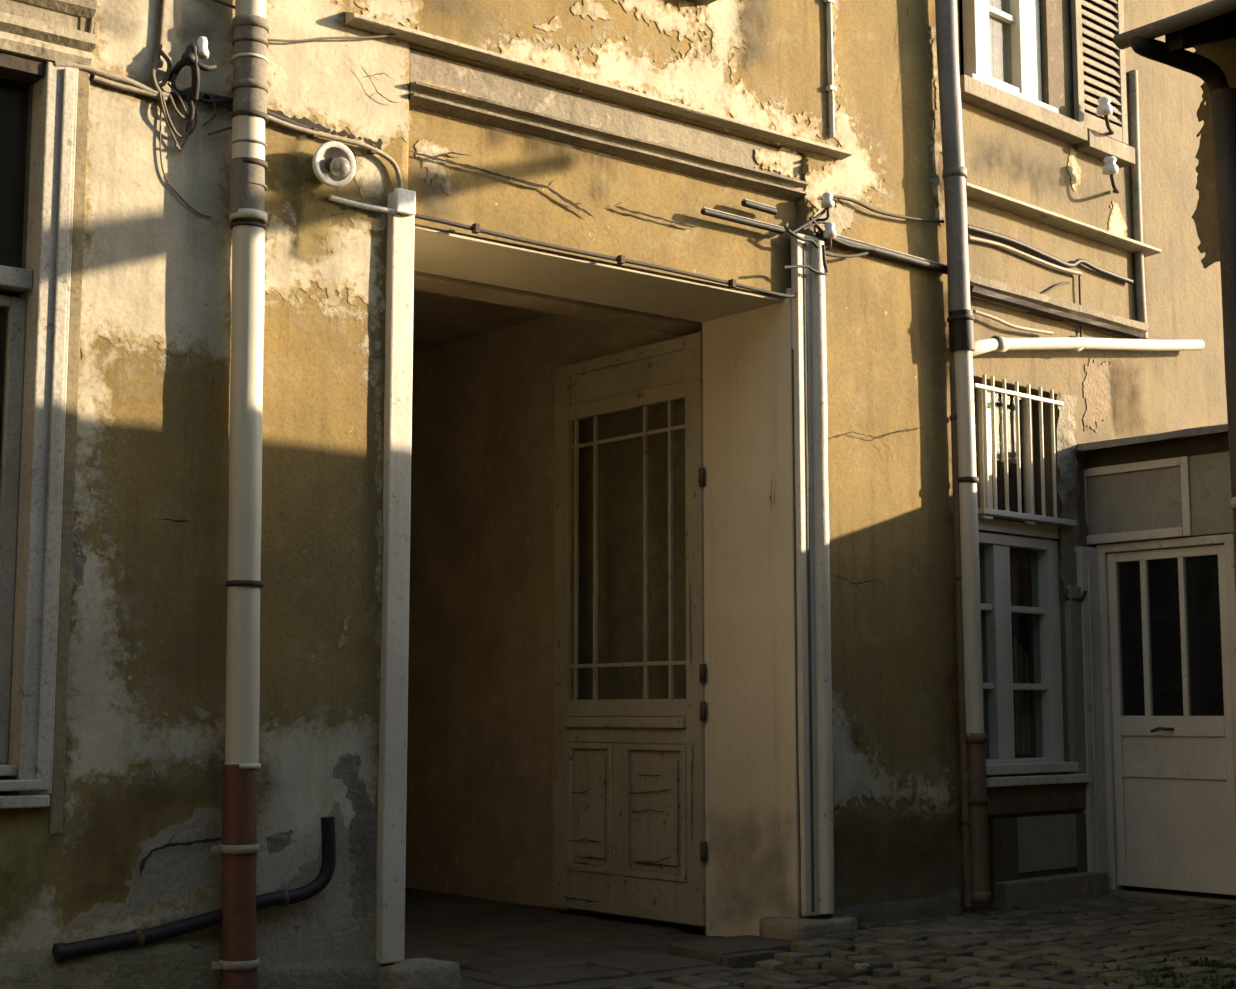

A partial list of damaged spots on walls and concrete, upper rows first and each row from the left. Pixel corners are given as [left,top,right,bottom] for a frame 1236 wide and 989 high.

crack [361,66,399,103]
peeling [472,0,892,235]
crack [410,151,698,228]
peeling [264,0,472,650]
peeling [63,0,235,862]
peeling [0,882,220,957]
crack [140,836,222,877]
peeling [256,666,381,918]
peeling [832,691,959,827]